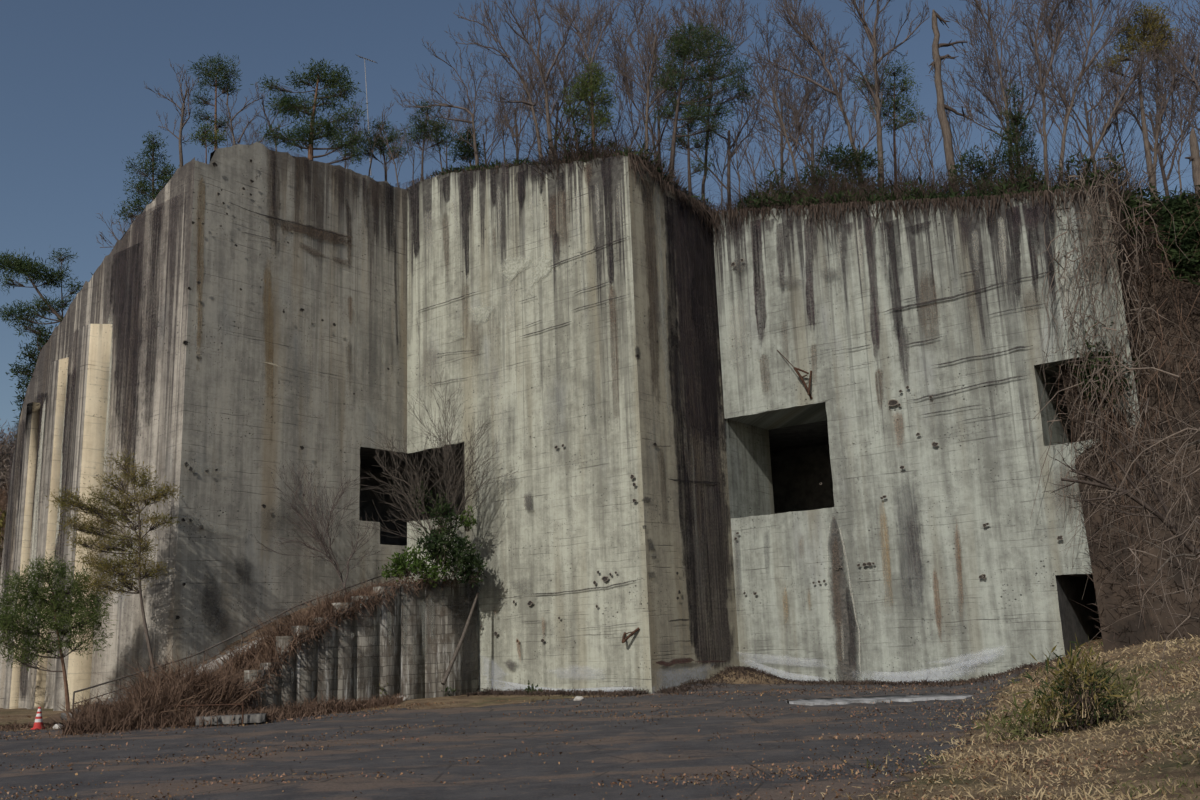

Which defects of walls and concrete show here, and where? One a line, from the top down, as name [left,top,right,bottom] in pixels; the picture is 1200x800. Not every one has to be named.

water stain [54,332,78,599]
water stain [104,207,175,492]
water stain [443,151,619,400]
water stain [641,169,733,667]
water stain [728,219,815,340]
water stain [848,216,930,371]
water stain [986,198,1074,316]